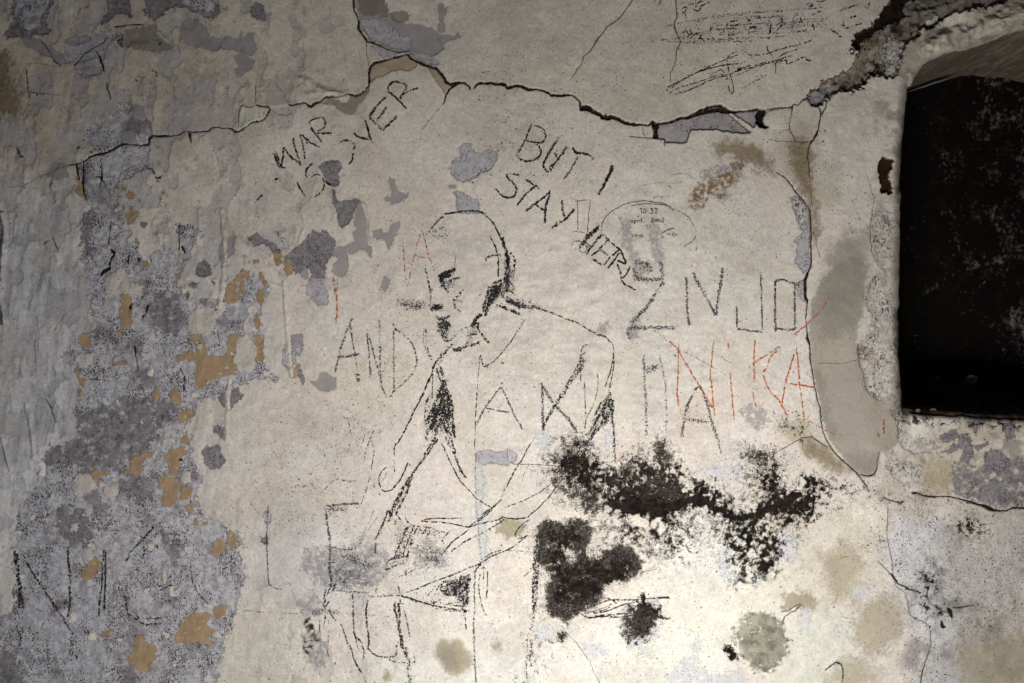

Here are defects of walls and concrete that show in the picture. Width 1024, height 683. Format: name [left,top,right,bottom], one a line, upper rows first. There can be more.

flaking render [323,0,460,115]
flaking render [805,0,996,107]
flaking render [448,143,498,214]
flaking render [652,108,792,143]
crack [9,0,1024,512]
flaking render [0,101,400,683]
flaking render [884,409,1024,507]
water stain [496,411,867,683]
crack [878,526,973,683]